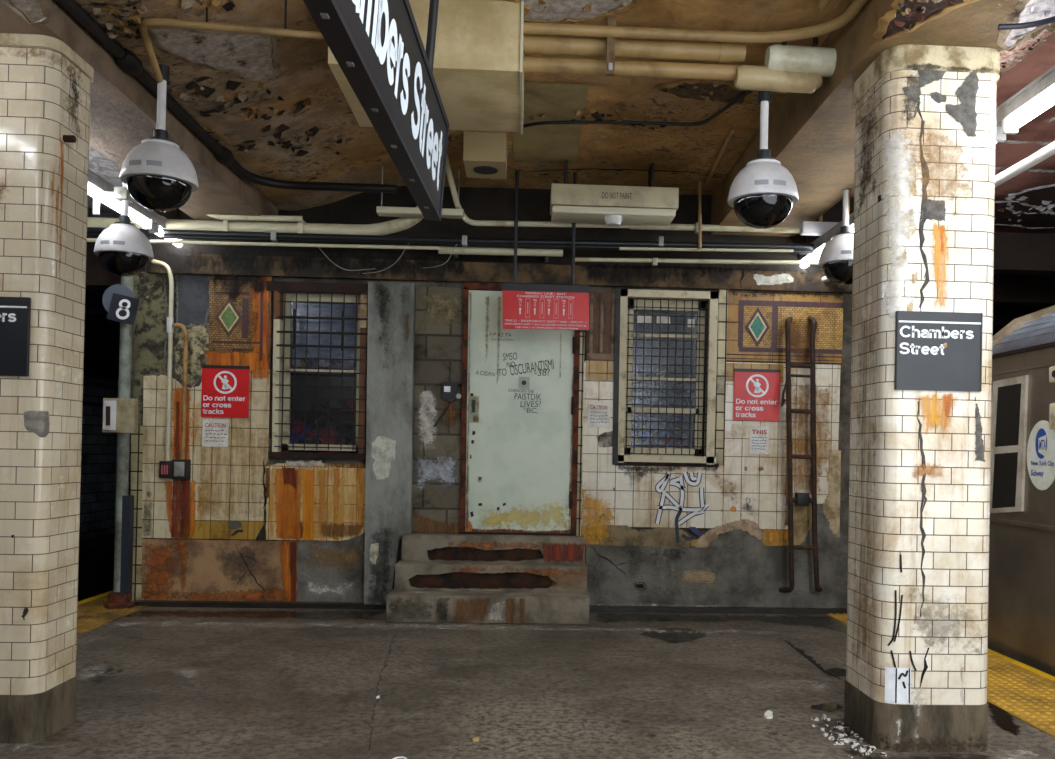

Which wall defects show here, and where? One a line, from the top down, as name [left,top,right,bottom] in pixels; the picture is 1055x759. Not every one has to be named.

spalling [0,0,53,24]
spalling [502,0,644,24]
spalling [873,0,980,42]
spalling [92,0,342,156]
peeling [903,0,1055,137]
rust [934,225,948,304]
spalling [24,411,50,437]
rust [922,394,952,431]
peeling [371,436,396,479]
rust [142,454,366,601]
crack [917,402,927,617]
crack [919,648,929,689]